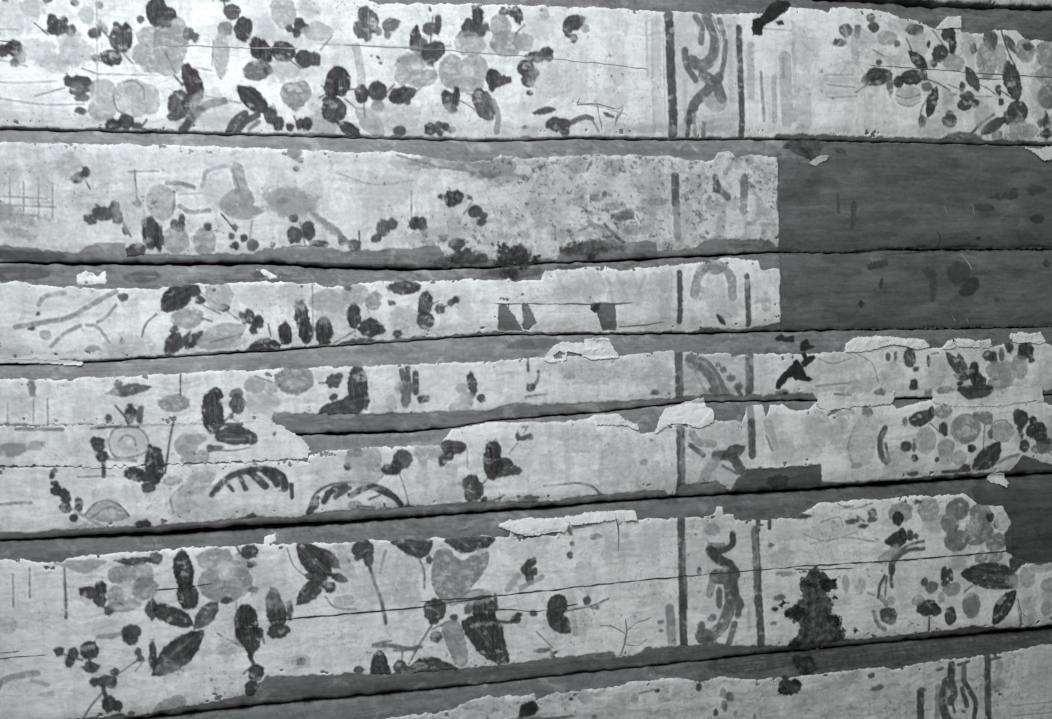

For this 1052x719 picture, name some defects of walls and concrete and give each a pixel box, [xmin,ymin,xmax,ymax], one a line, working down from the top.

peeling [777,142,1052,353]
peeling [0,419,311,469]
peeling [596,414,639,430]
peeling [655,398,715,434]
peeling [972,456,1052,565]
water stain [773,566,858,696]